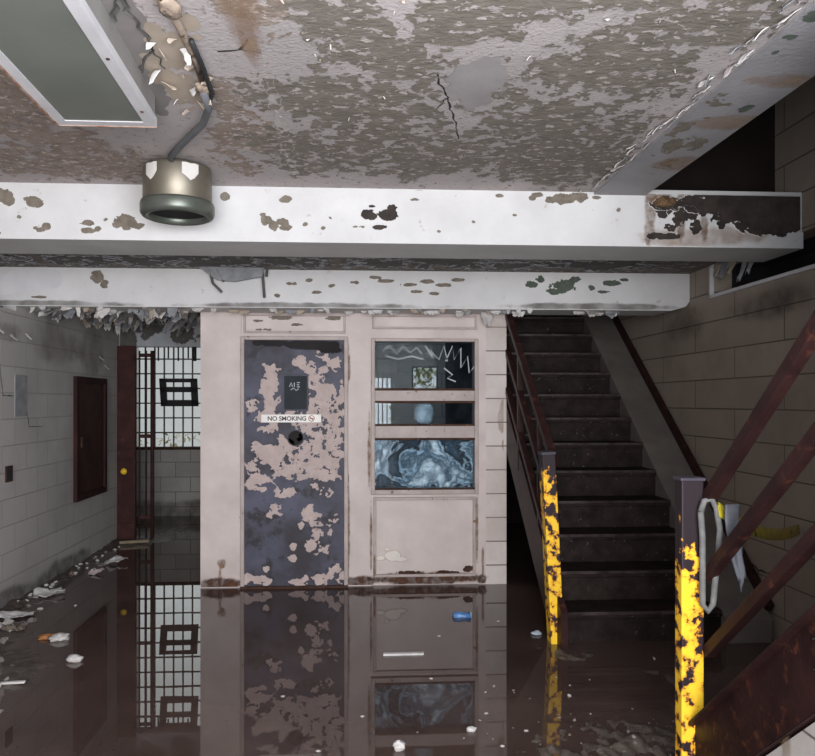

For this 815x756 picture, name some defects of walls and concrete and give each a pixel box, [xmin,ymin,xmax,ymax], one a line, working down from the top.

crack [110,0,166,74]
peeling [0,71,162,184]
crack [436,74,464,156]
peeling [101,0,815,206]
peeling [353,204,399,231]
peeling [646,194,801,240]
peeling [0,253,335,294]
peeling [342,257,655,296]
peeling [29,295,217,346]
peeling [228,308,399,519]
peeling [287,504,339,563]
peeling [288,563,344,586]